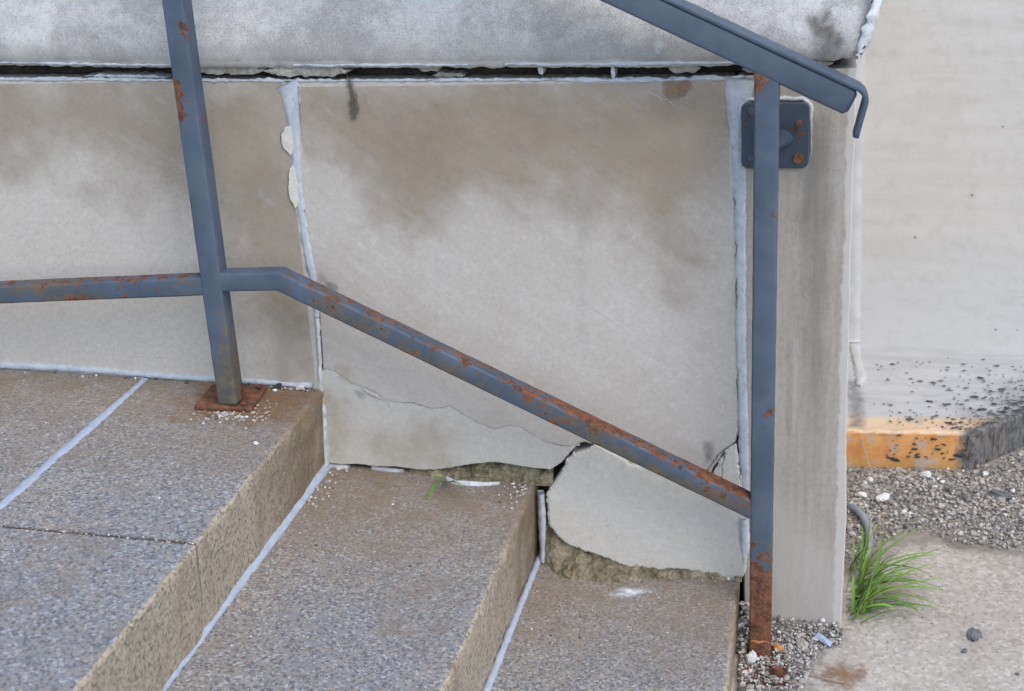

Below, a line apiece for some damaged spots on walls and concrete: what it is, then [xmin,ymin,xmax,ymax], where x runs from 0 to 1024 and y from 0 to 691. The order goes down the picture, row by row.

peeling [280,126,299,211]
leakage [306,73,727,217]
crack [323,368,571,447]
crack [707,374,741,483]
spalling [410,462,742,583]